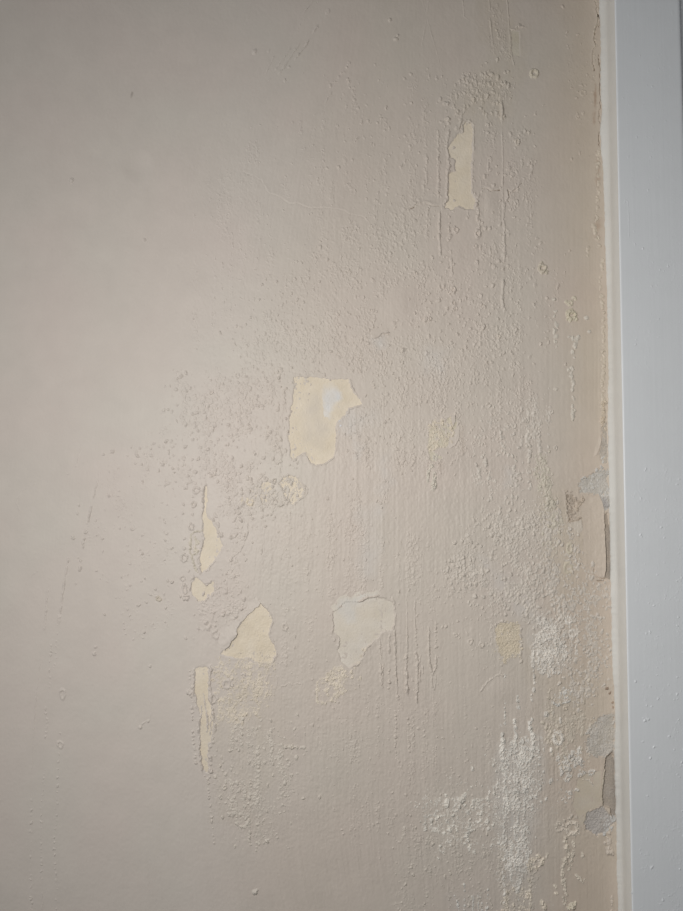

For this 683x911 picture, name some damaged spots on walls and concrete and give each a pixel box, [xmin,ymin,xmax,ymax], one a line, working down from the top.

peeling [436,106,482,242]
peeling [188,485,223,605]
peeling [281,377,364,467]
peeling [565,399,609,577]
peeling [186,597,301,845]
spalling [584,687,616,836]